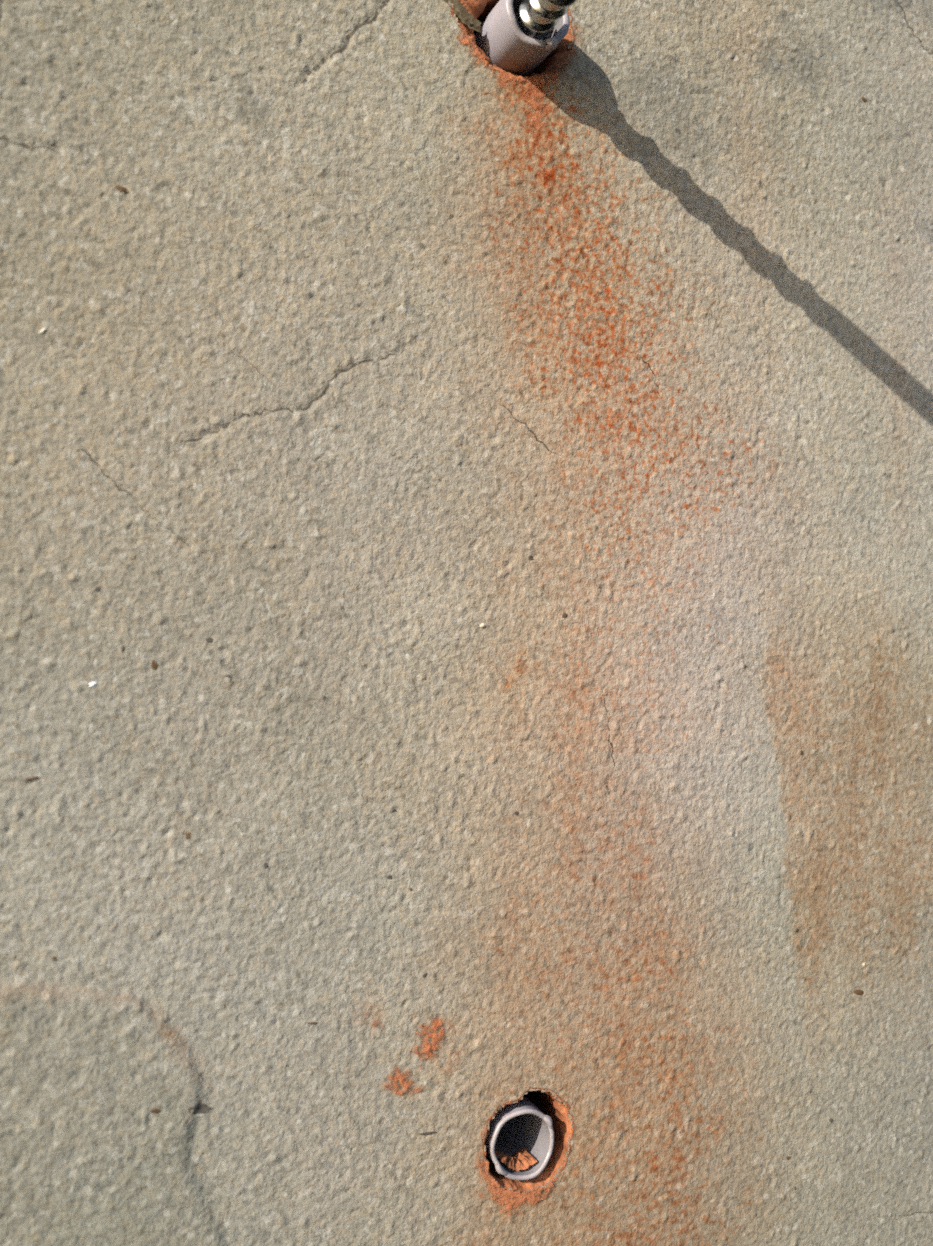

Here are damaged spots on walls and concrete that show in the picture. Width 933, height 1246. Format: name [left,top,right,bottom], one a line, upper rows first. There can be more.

crack [302,0,389,83]
corrosion [459,26,577,173]
crack [0,137,50,150]
crack [176,350,404,451]
corrosion [384,1018,451,1095]
corrosion [477,1160,553,1215]